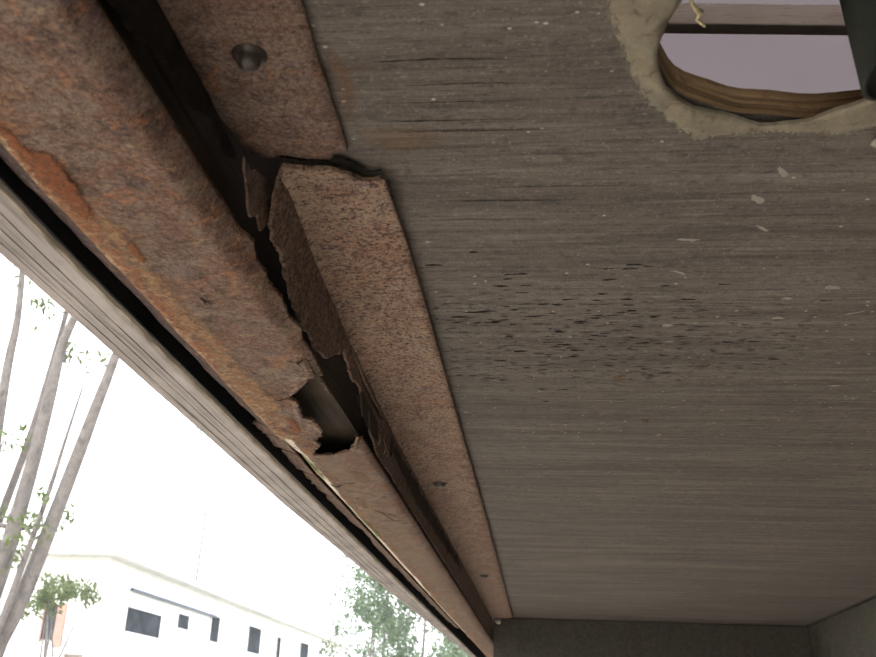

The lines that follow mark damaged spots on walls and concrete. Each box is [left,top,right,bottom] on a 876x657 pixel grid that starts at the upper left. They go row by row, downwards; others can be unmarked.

rust [242,157,272,231]
crack [280,155,382,172]
rust [101,219,465,632]